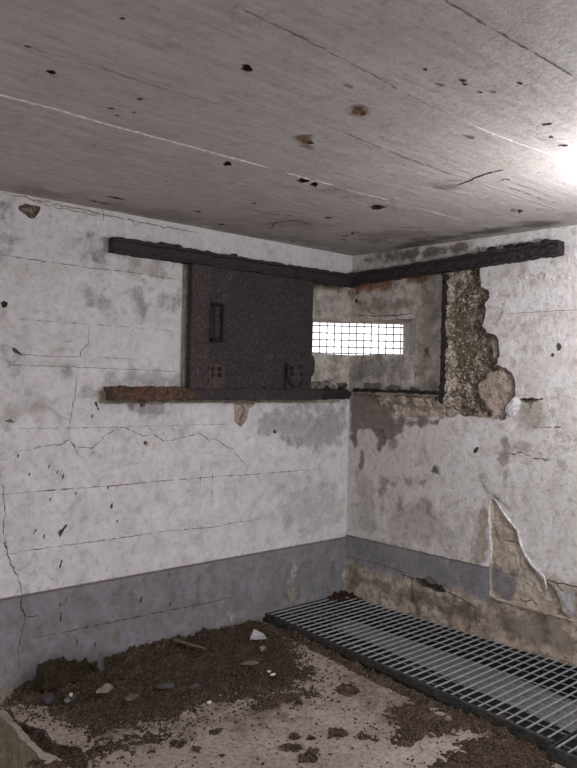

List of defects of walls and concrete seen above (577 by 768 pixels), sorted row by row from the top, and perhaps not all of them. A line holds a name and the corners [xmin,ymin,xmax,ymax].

crack [445,0,572,76]
crack [330,128,576,207]
spalling [18,204,40,219]
crack [0,192,195,233]
spalling [352,268,544,426]
spalling [234,402,255,427]
crack [0,319,316,665]
leakage [258,392,442,533]
peeling [487,497,577,653]